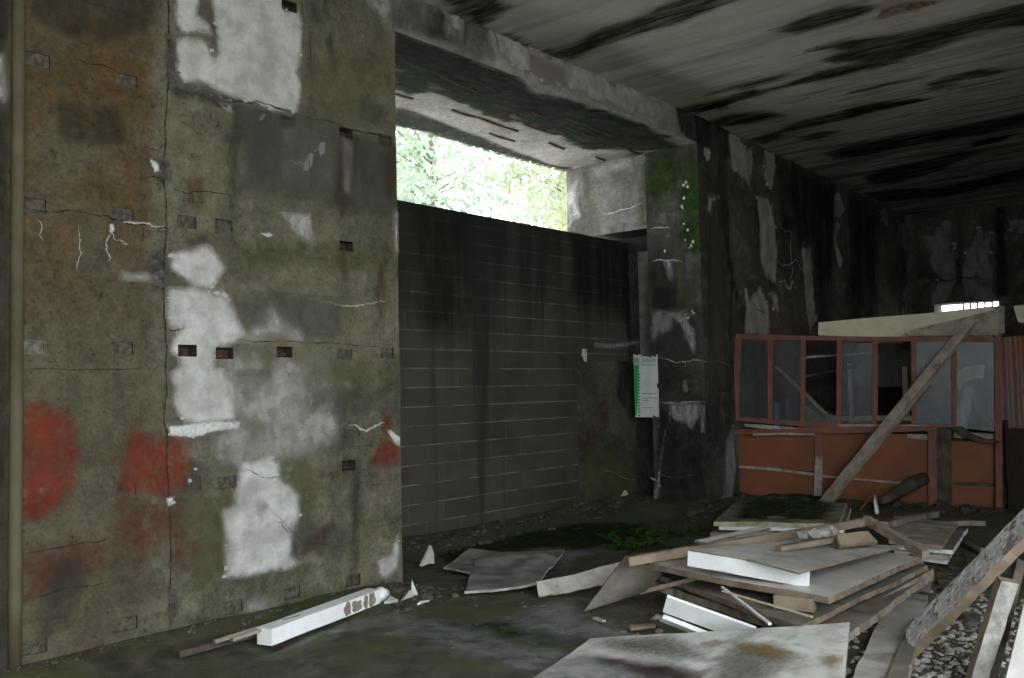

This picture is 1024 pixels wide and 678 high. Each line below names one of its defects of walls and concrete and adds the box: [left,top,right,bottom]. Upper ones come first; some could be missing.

peeling [164,0,302,115]
peeling [167,245,245,439]
crack [23,0,393,627]
damp [396,108,574,172]
flaking render [638,251,695,358]
flaking render [729,134,779,335]
damp [588,1,1024,387]
flaking render [801,246,817,334]
flaking render [833,191,846,269]
peeling [222,456,302,578]